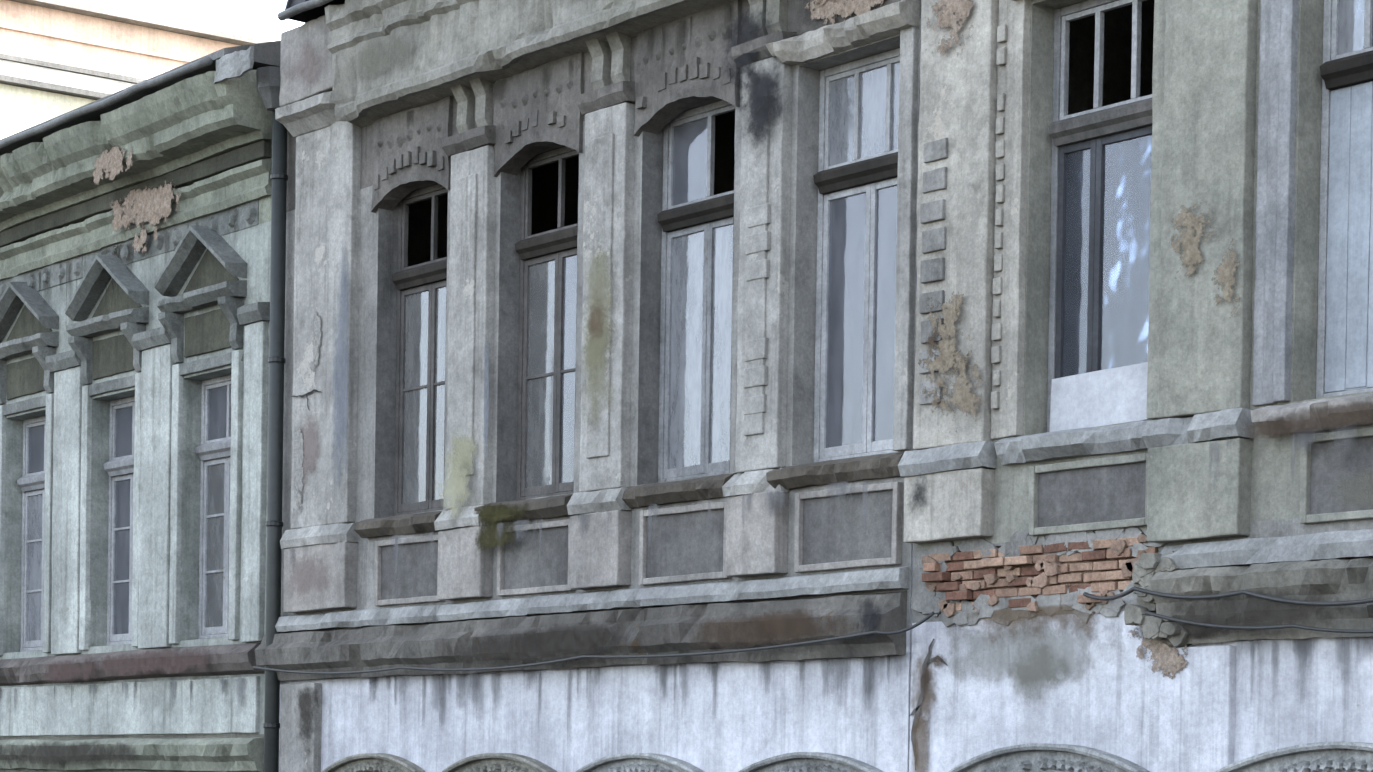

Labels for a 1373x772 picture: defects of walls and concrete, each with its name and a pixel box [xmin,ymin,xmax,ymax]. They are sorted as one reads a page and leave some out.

peeling [805,0,884,25]
peeling [925,0,974,55]
peeling [93,146,133,185]
peeling [110,180,181,253]
peeling [918,292,982,432]
leakage [455,622,629,662]
spalling [911,527,1191,679]
leakage [1173,592,1346,638]
crack [909,639,948,769]